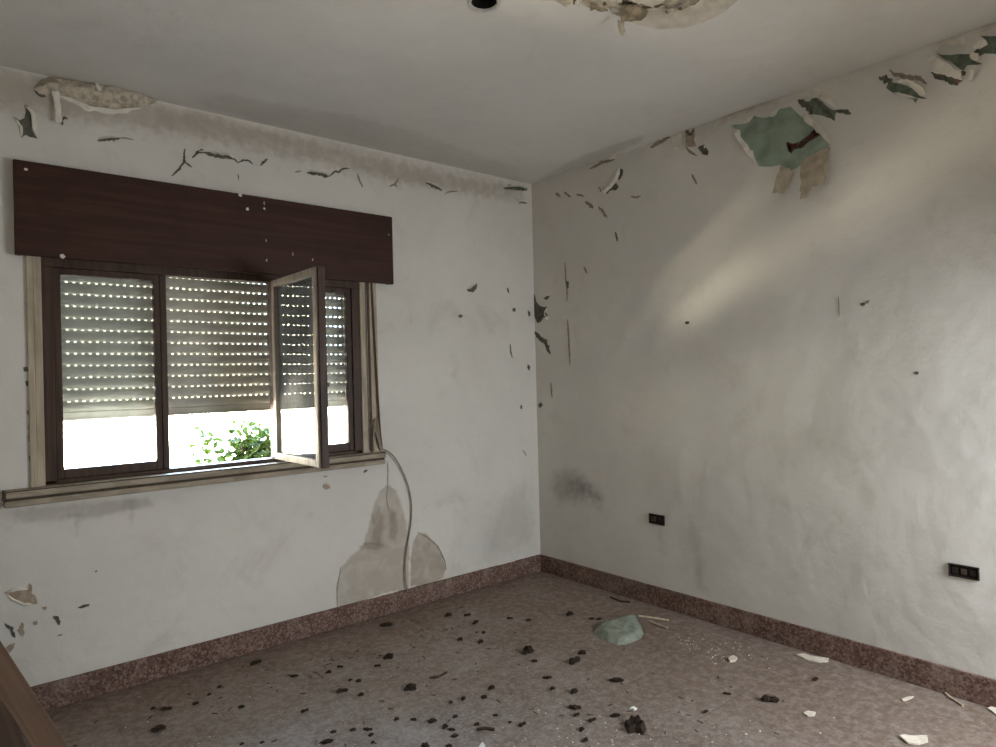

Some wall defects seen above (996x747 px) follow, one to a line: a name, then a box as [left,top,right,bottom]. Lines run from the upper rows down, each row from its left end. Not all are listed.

spalling [471,0,497,9]
peeling [545,0,738,37]
peeling [879,24,996,103]
peeling [13,104,38,139]
peeling [707,88,840,200]
peeling [5,583,63,636]
peeling [5,621,38,653]